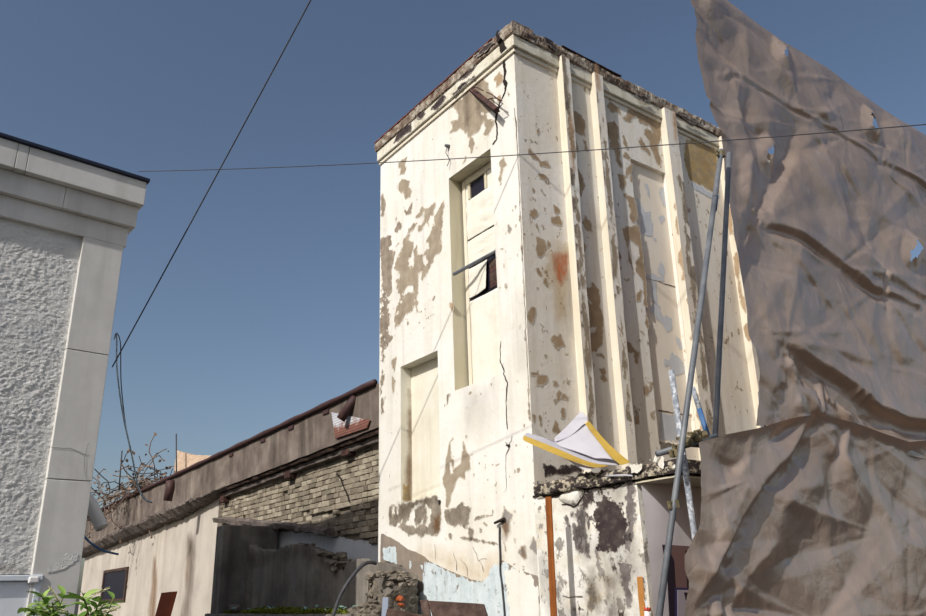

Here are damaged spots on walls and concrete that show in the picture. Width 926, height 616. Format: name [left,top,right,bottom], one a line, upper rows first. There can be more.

peeling [393,41,503,164]
peeling [379,157,445,415]
crack [492,30,531,489]
peeling [519,306,544,329]
peeling [529,208,551,290]
peeling [562,54,608,425]
peeling [597,92,720,435]
crack [6,433,90,480]
peeling [289,435,547,616]
spalling [543,463,584,478]
leakage [533,469,609,484]
leakage [563,481,638,616]